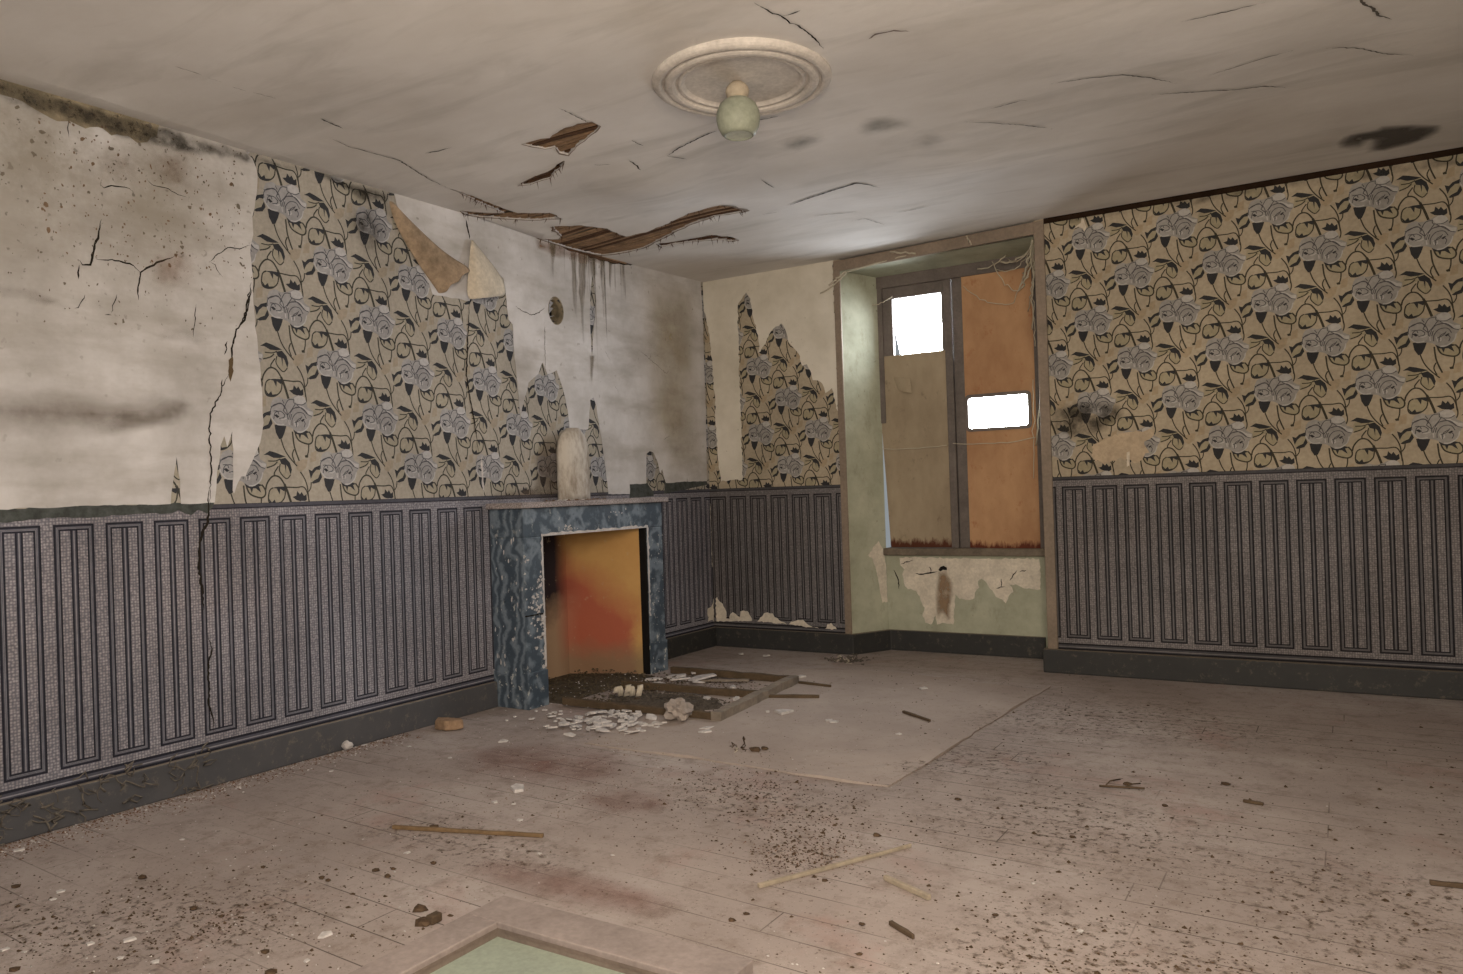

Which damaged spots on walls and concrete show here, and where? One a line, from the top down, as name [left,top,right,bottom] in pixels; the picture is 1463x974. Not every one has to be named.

crack [755,3,822,47]
crack [975,0,1399,129]
spalling [0,79,216,151]
leakage [1345,127,1434,150]
leakage [0,89,252,297]
crack [77,182,185,315]
leakage [539,243,624,303]
spalling [451,189,749,256]
crack [193,245,252,731]
flaking render [707,598,836,630]
flaking render [868,541,1041,624]